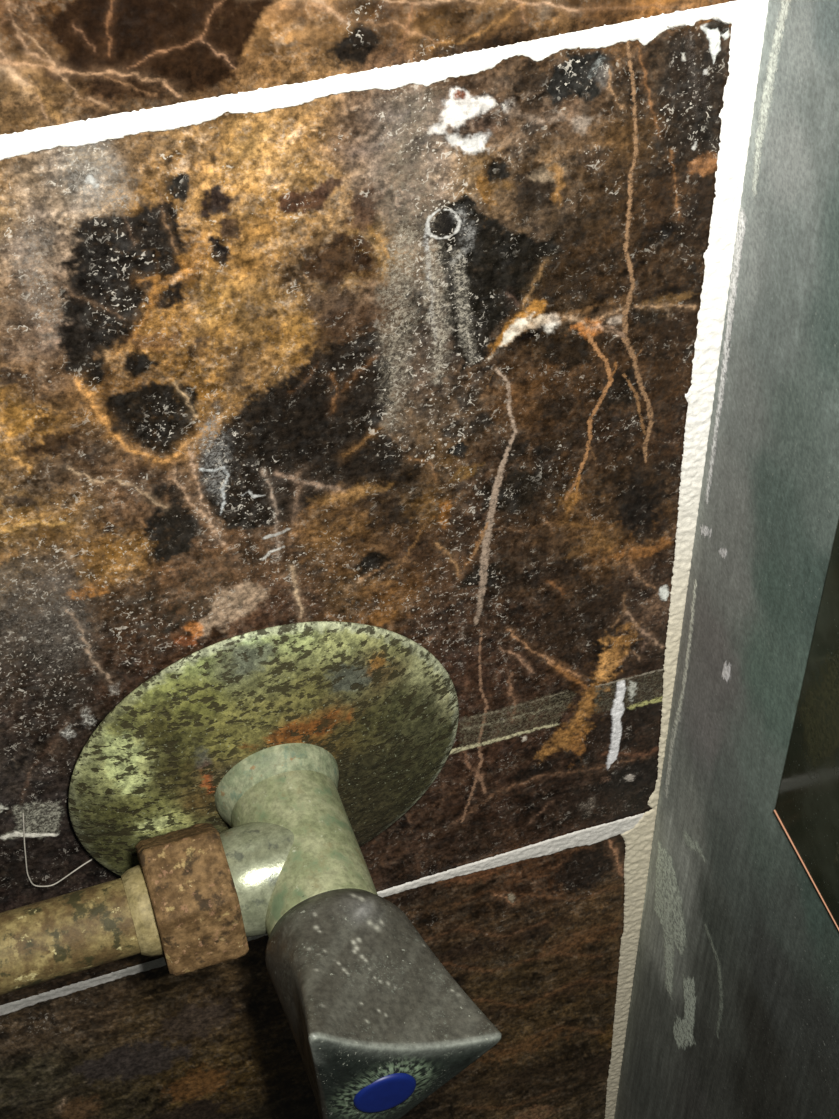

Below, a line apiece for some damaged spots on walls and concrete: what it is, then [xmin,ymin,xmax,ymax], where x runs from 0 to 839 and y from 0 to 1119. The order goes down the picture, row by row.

leakage [424,209,474,381]